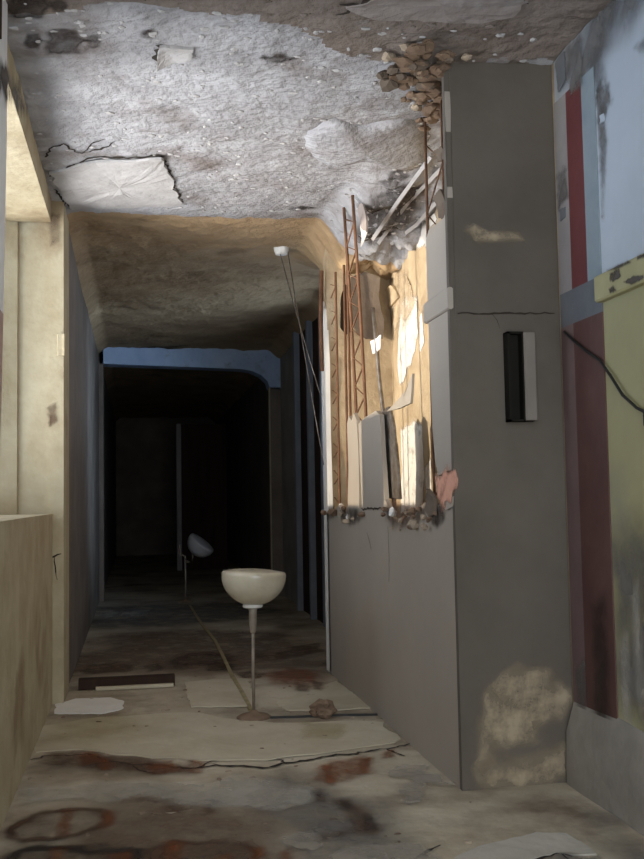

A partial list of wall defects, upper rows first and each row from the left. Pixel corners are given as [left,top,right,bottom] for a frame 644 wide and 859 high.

peeling [346,0,528,24]
leakage [563,0,641,78]
spalling [376,39,472,132]
leakage [596,89,606,173]
crack [45,139,183,207]
spalling [359,170,417,241]
peeling [397,297,424,383]
peeling [387,422,458,526]
leakage [50,752,201,773]
crack [30,743,410,774]
leakage [2,795,280,859]
leakage [285,787,385,859]